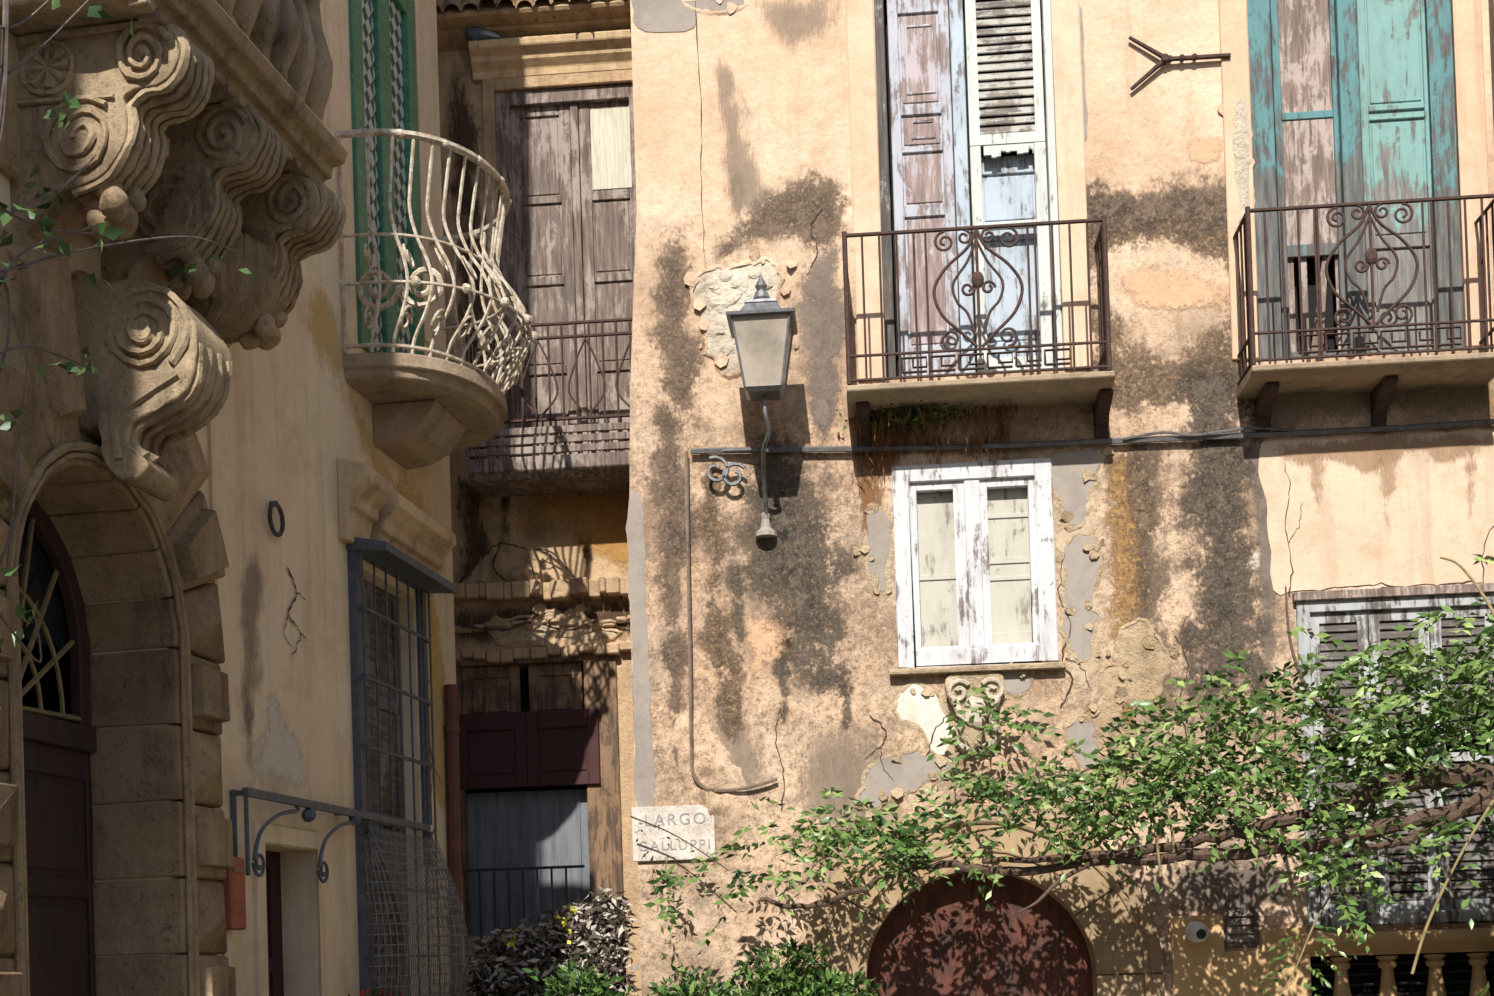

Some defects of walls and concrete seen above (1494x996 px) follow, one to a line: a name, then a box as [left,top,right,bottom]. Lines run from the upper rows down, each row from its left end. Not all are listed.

peeling [682,0,748,16]
peeling [684,246,797,380]
damp [717,64,847,439]
damp [1086,182,1229,284]
crack [284,567,307,657]
crack [458,542,630,632]
damp [726,432,859,728]
peeling [1043,438,1180,790]
damp [1086,300,1276,748]
damp [1283,434,1494,500]
peeling [854,679,963,821]